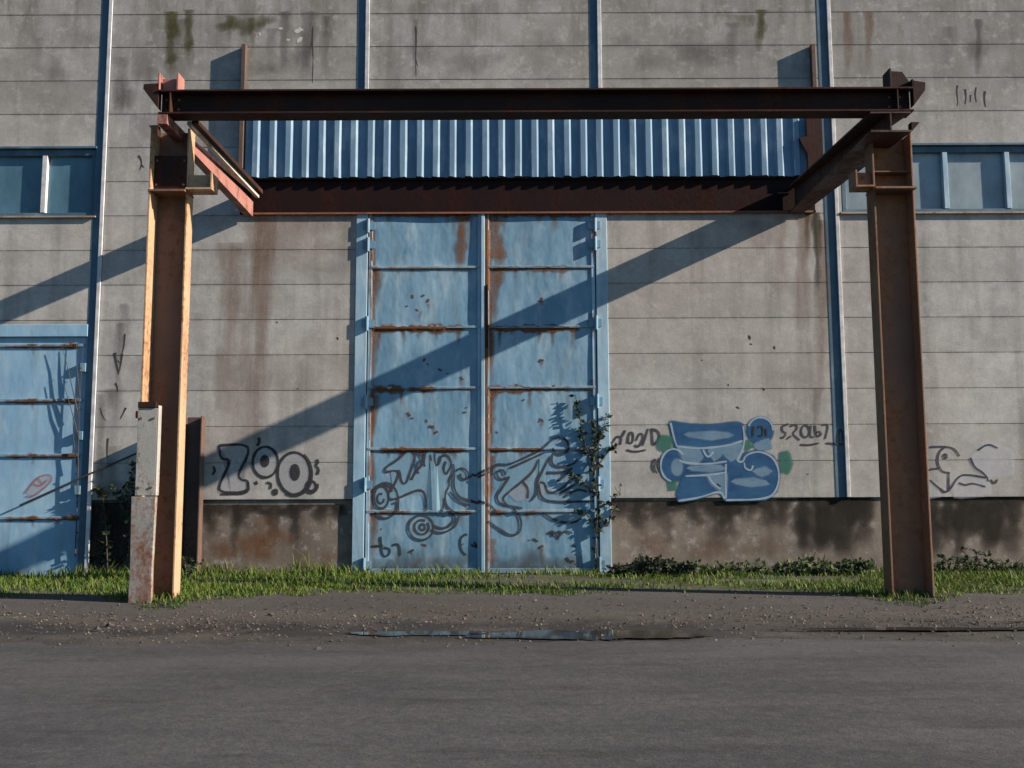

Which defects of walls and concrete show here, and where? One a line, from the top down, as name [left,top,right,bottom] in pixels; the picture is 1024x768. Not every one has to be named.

water stain [167,9,192,64]
corrosion [370,214,469,353]
corrosion [486,214,594,364]
water stain [203,504,344,531]
corrosion [369,385,464,476]
corrosion [486,385,569,561]
water stain [614,497,873,551]
water stain [930,497,1024,551]